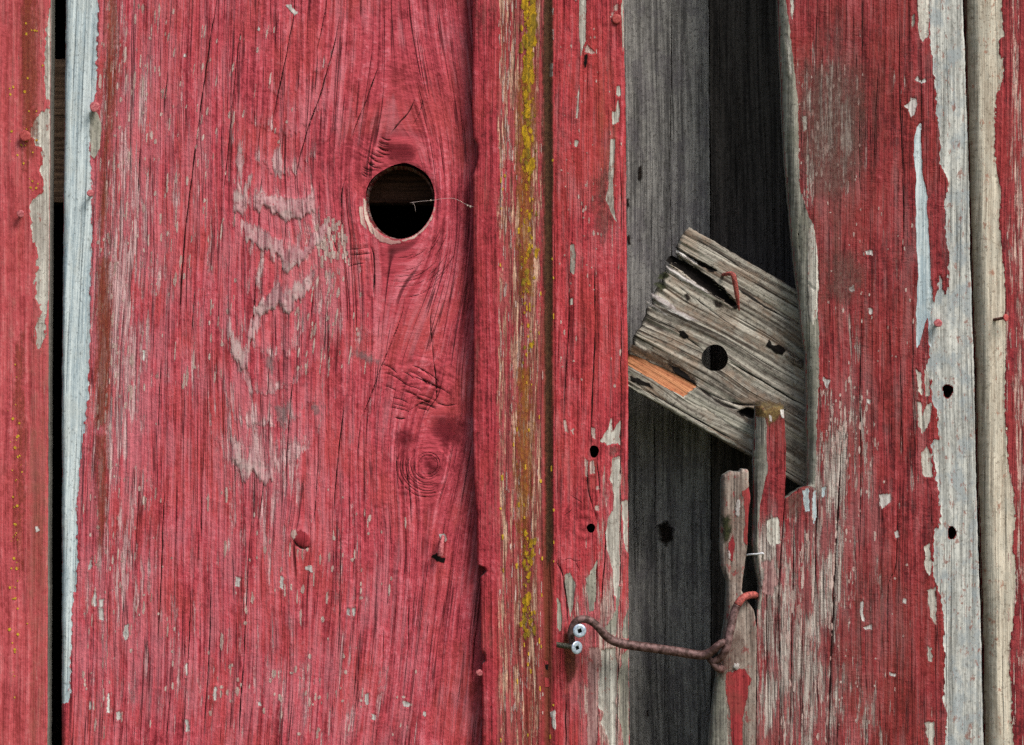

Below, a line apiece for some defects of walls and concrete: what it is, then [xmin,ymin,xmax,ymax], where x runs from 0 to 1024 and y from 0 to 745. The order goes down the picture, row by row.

peeling [567,0,597,54]
peeling [29,9,51,349]
peeling [578,86,622,250]
peeling [62,0,217,739]
peeling [559,244,602,305]
spalling [737,0,879,692]
peeling [902,0,1017,745]
peeling [860,481,900,508]
peeling [557,561,597,631]
peeling [587,420,629,745]
peeling [208,663,250,716]
spalling [709,663,739,745]